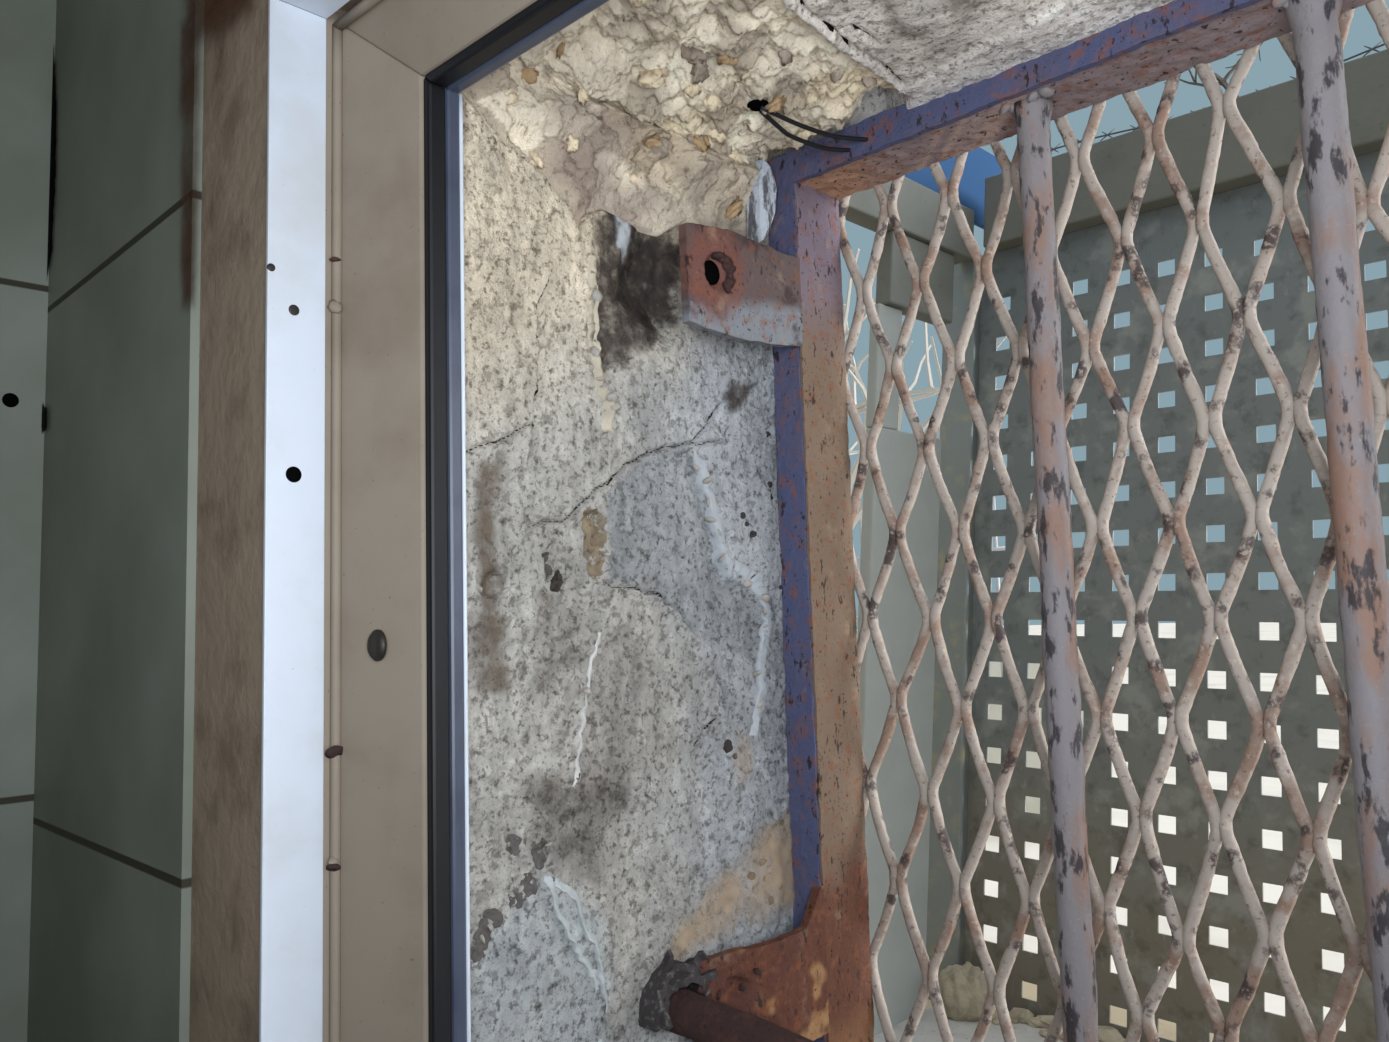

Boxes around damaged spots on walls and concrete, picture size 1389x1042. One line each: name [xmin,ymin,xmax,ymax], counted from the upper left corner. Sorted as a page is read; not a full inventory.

spalling [462,0,896,243]
crack [466,279,549,452]
crack [532,399,723,526]
crack [605,582,666,604]
rust [676,822,794,950]